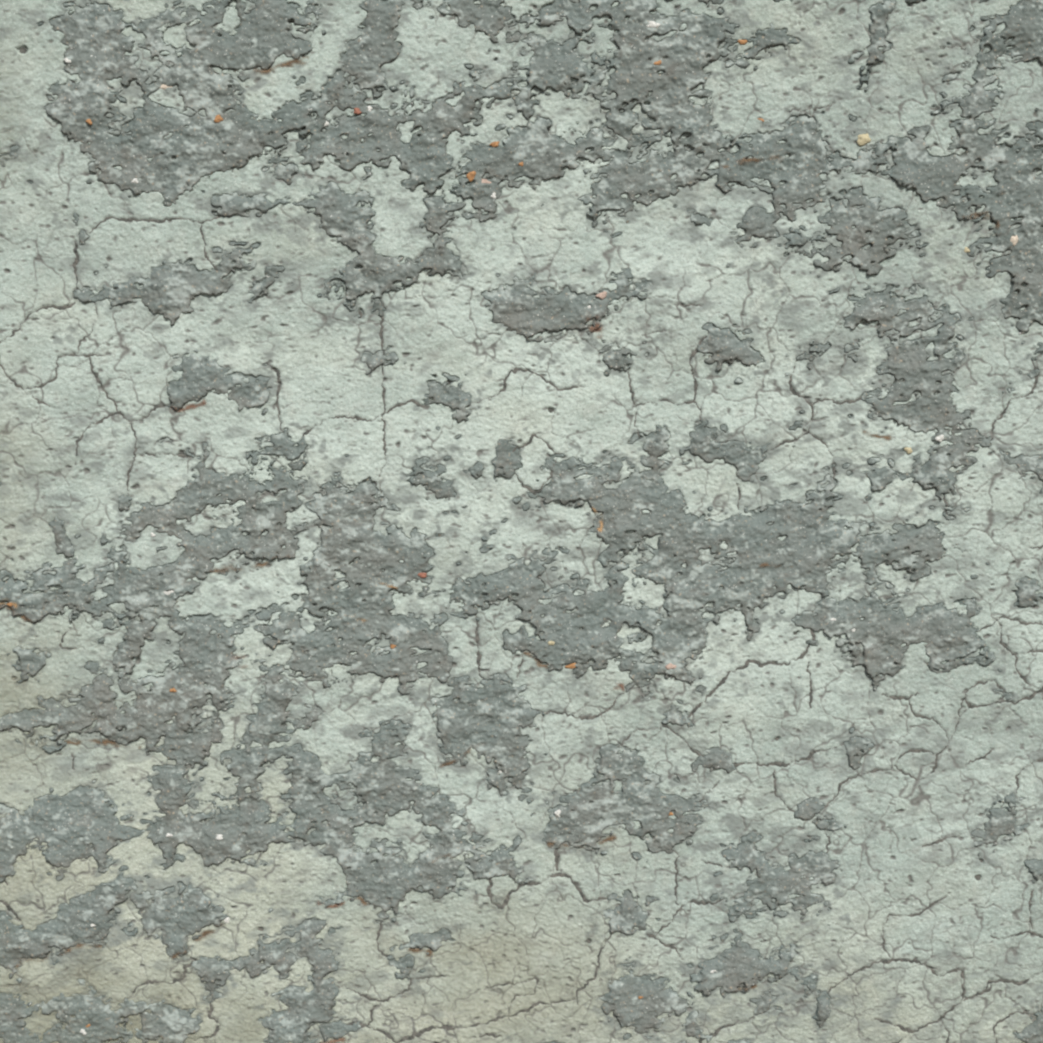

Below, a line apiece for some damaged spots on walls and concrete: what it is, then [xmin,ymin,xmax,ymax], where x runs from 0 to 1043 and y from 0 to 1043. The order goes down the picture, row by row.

spalling [38,0,1043,344]
crack [0,215,221,495]
crack [266,299,425,486]
spalling [0,268,1043,1043]
crack [618,629,844,812]
crack [824,616,1043,853]
crack [337,933,612,1043]
crack [486,848,607,909]
crack [647,850,737,960]
crack [698,1014,755,1043]
crack [827,896,1039,1043]
crack [991,890,1043,939]